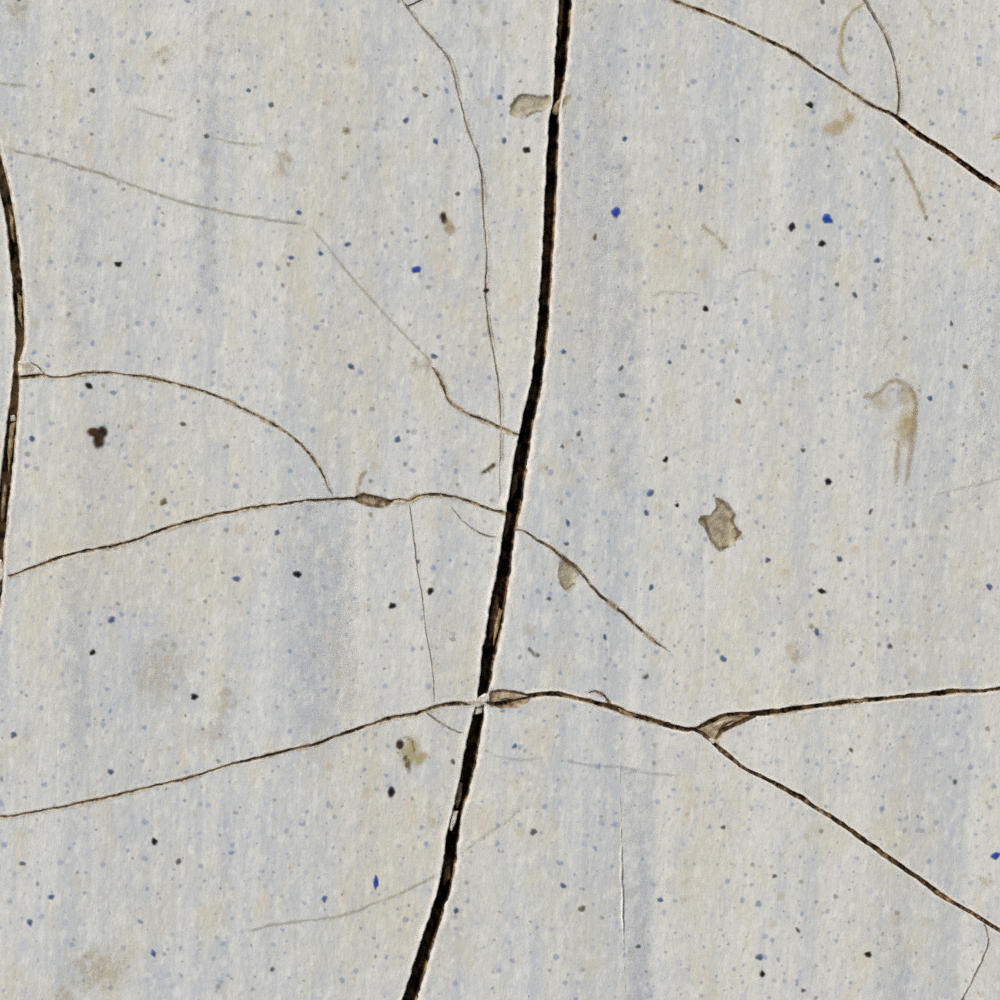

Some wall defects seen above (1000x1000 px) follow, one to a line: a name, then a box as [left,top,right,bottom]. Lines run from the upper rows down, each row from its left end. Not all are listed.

spalling [509,93,571,118]
crack [0,134,357,628]
crack [388,0,1000,1000]
spalling [698,497,743,549]
crack [0,699,470,818]